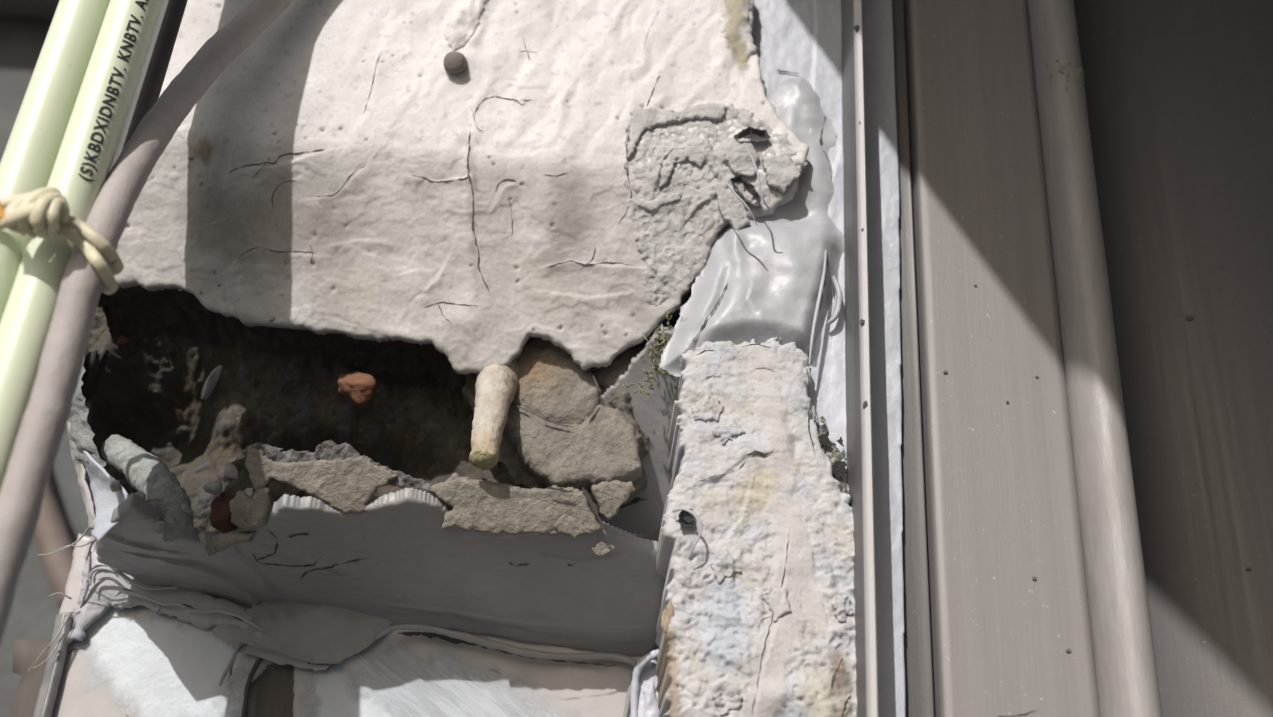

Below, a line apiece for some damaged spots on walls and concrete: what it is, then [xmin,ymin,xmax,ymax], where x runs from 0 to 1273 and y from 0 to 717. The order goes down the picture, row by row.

crack [238,245,317,261]
crack [228,149,366,207]
crack [410,96,529,324]
peeling [624,103,808,330]
spalling [81,285,648,556]